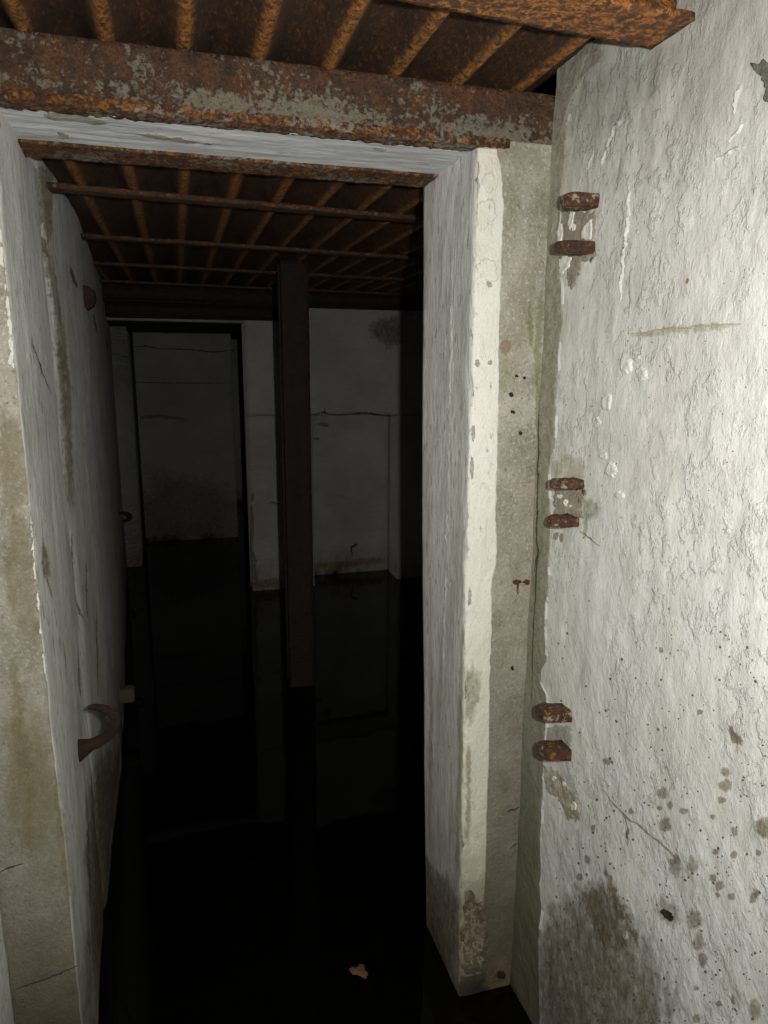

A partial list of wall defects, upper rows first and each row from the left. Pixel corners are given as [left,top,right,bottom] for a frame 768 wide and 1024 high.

peeling [750,59,768,102]
crack [532,391,540,658]
leakage [582,871,636,948]